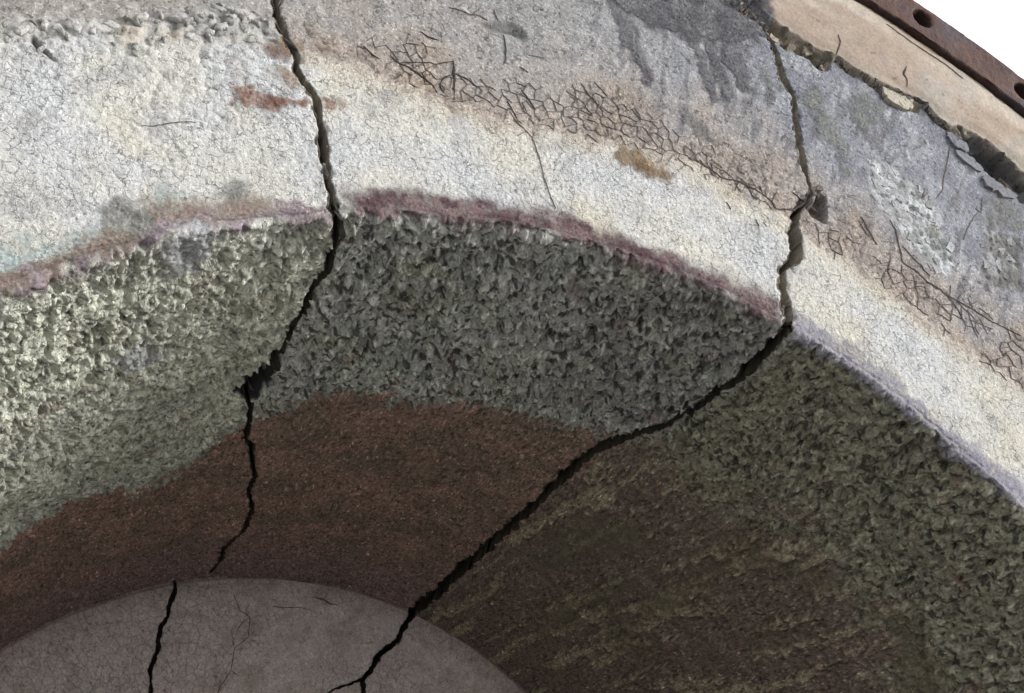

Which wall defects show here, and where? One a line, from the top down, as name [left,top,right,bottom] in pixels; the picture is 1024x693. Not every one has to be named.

spalling [737,2,838,72]
crack [141,120,196,128]
rust [230,86,308,112]
spalling [881,86,914,112]
spalling [946,124,1024,204]
crack [210,0,346,693]
crack [327,7,1024,693]
crack [147,581,177,693]